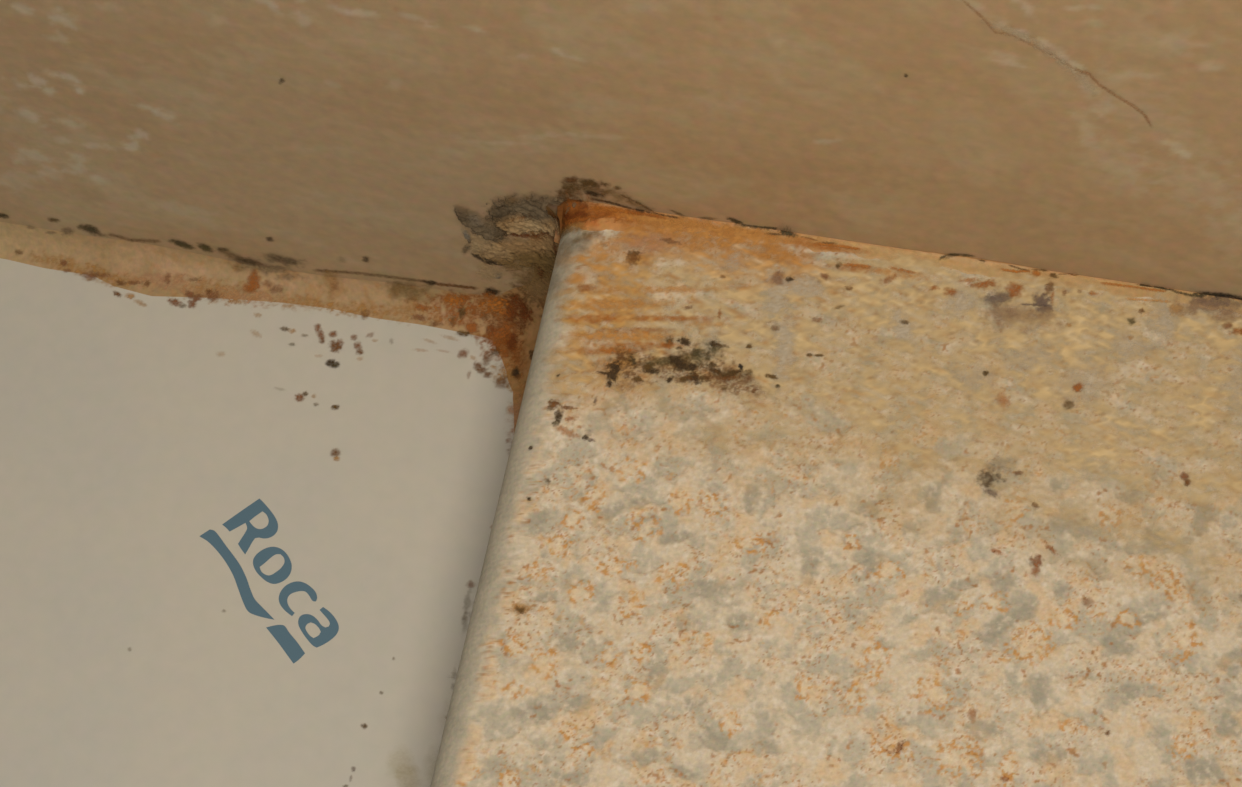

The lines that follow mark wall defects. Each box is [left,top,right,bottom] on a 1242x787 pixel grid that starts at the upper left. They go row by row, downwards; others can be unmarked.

rust [506,200,684,238]
rust [412,282,546,387]
damp [548,179,1242,505]